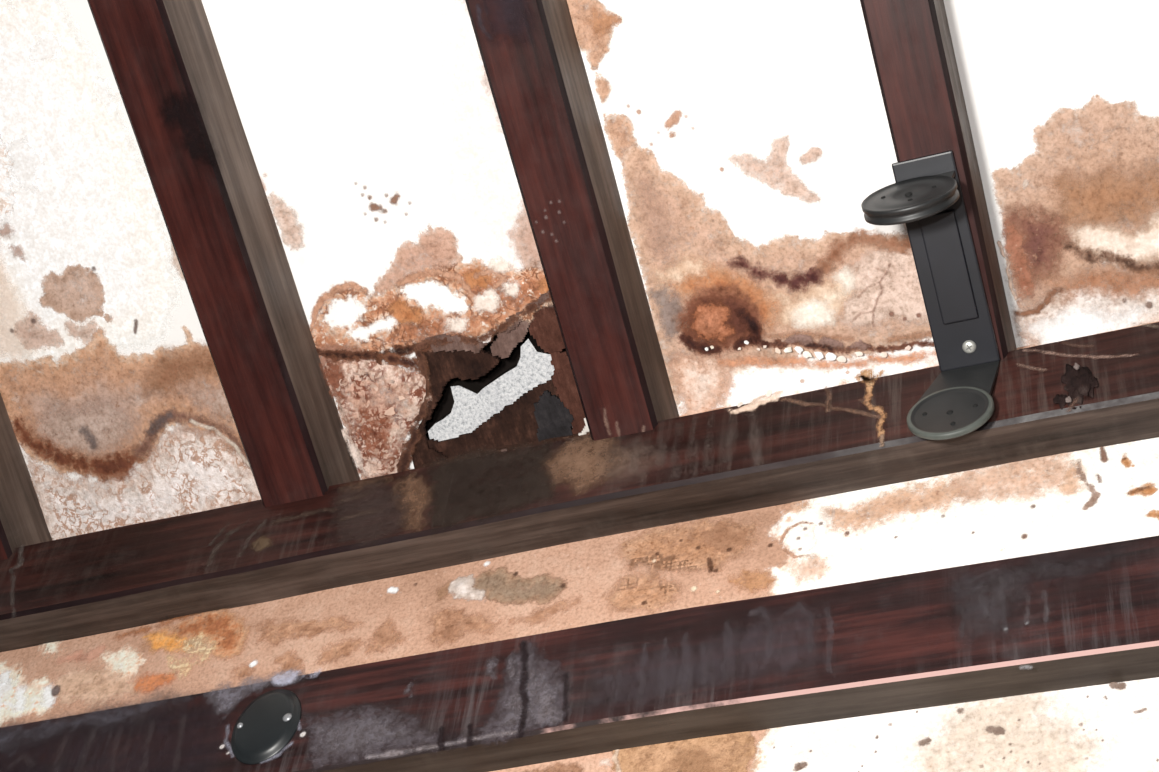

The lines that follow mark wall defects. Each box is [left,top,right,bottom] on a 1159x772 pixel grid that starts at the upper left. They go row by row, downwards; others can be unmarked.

leakage [0,0,261,540]
leakage [374,226,463,296]
rust [677,284,770,355]
leakage [567,0,939,416]
leakage [992,95,1159,347]